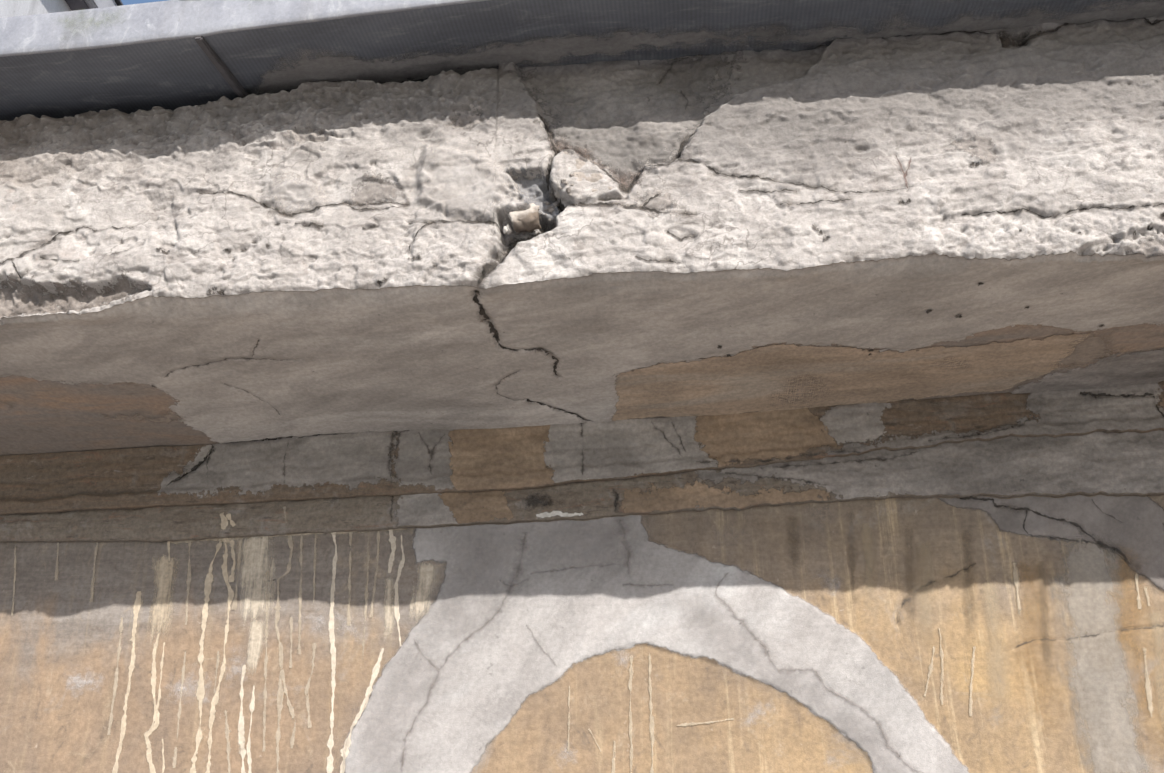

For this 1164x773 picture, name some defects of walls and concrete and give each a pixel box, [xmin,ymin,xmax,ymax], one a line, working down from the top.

crack [1,226,129,279]
spalling [498,166,560,264]
crack [962,203,1164,218]
crack [199,114,912,474]
crack [165,340,275,393]
crack [168,410,347,485]
leakage [107,506,434,773]